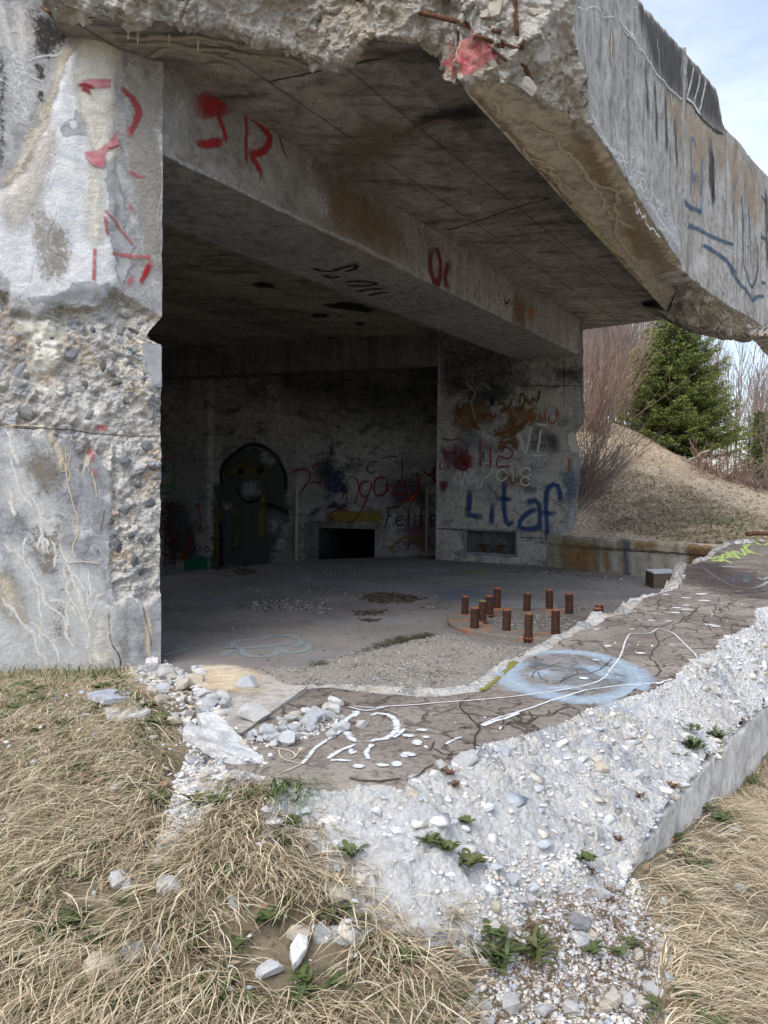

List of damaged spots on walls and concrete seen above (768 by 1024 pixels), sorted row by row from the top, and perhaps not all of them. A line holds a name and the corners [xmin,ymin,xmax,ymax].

spalling [41,0,595,139]
water stain [633,4,723,167]
crack [593,116,681,250]
water stain [710,147,730,207]
water stain [756,186,768,257]
spalling [0,74,162,606]
spalling [642,273,768,343]
crack [14,427,160,557]
corrosion [687,544,708,564]
crack [108,608,121,667]
spalling [145,656,158,672]
crack [349,593,756,782]